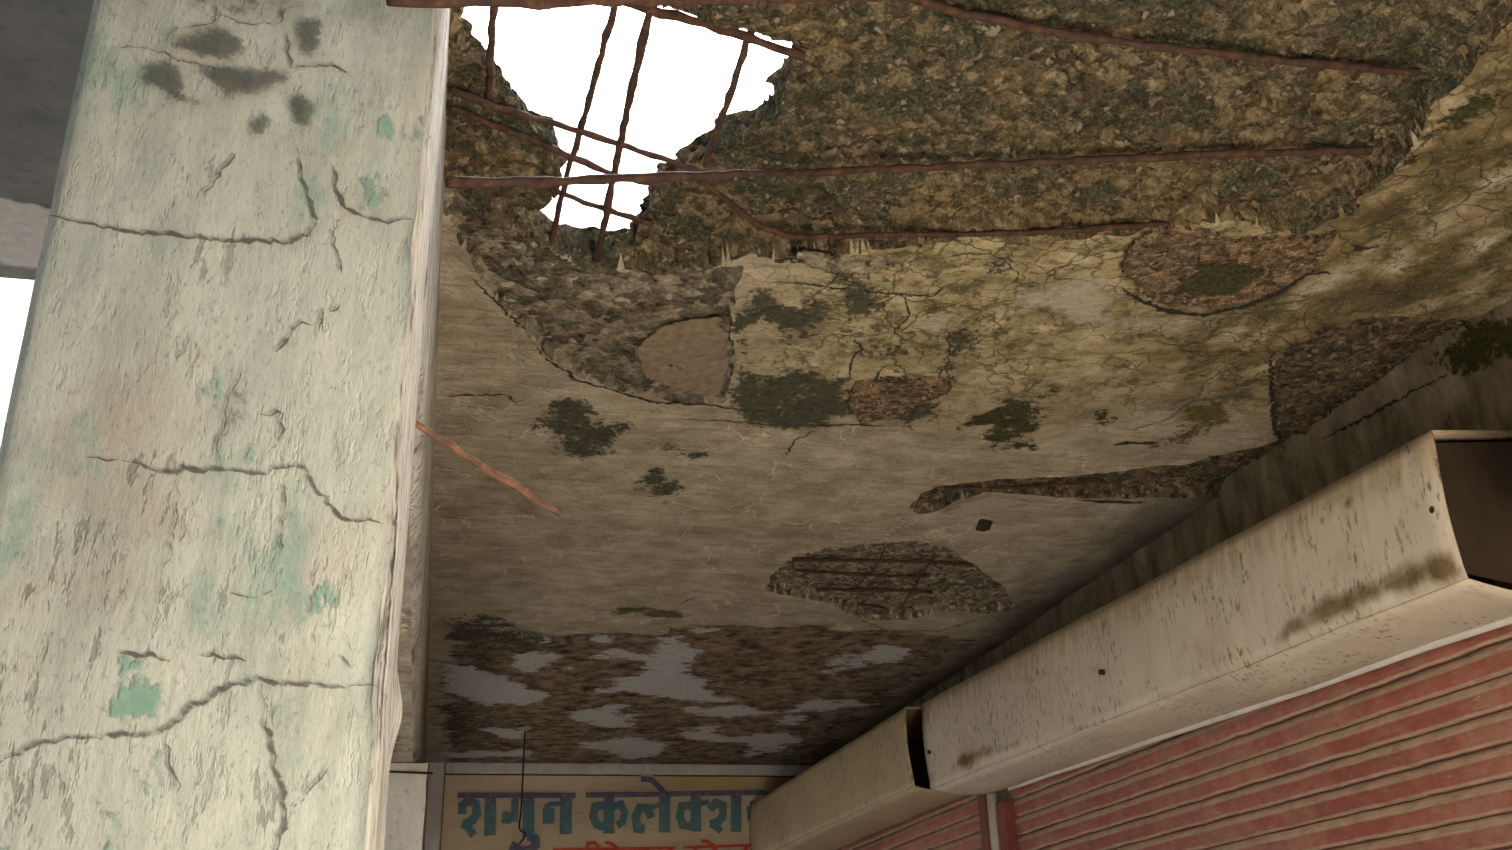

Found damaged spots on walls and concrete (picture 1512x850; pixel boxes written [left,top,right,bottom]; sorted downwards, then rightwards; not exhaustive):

leakage [143,61,198,103]
leakage [173,0,291,95]
leakage [250,116,271,134]
leakage [292,95,315,125]
leakage [297,18,321,55]
crack [50,148,413,352]
spalling [371,0,1512,405]
spalling [910,302,1508,514]
spalling [976,519,993,532]
crack [0,371,405,850]
peeling [403,541,1016,765]